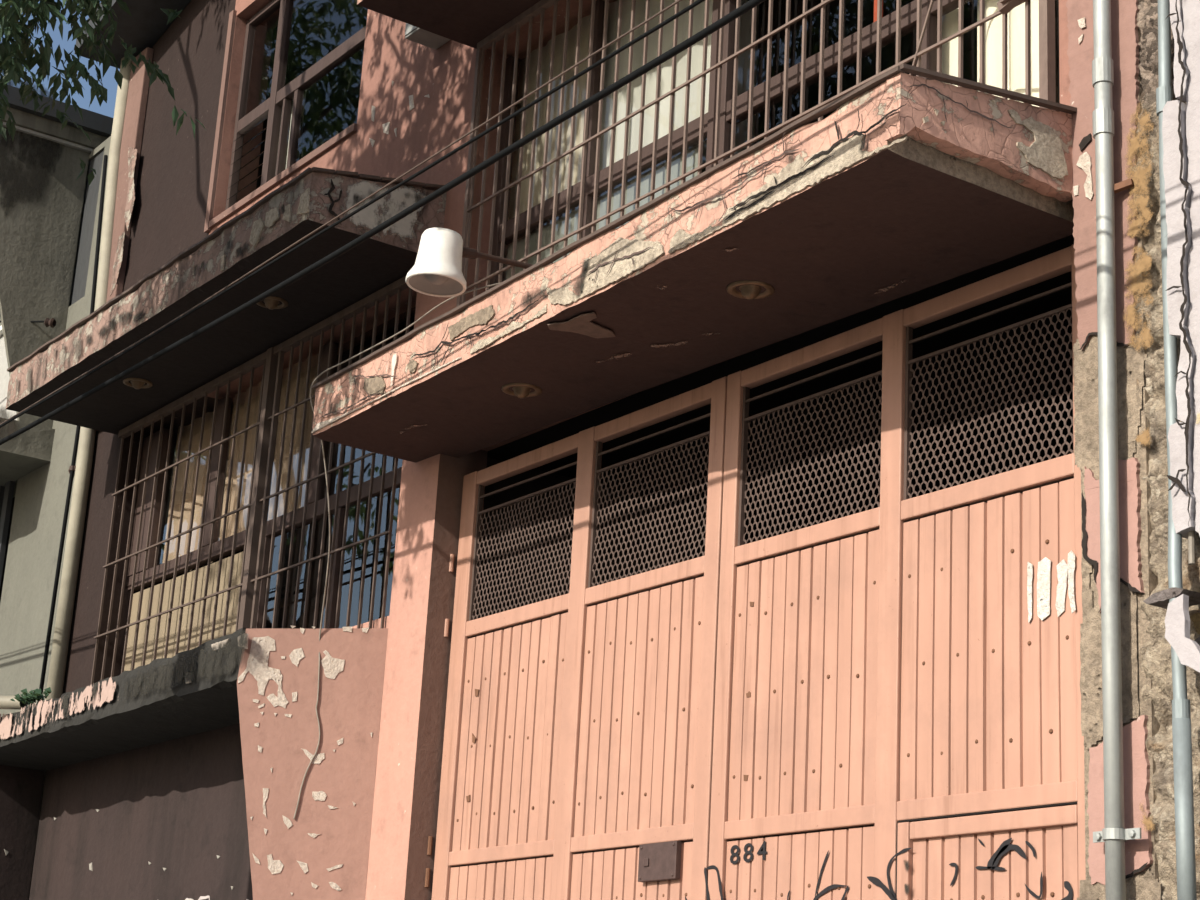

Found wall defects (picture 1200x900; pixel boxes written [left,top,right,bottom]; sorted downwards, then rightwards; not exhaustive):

leakage [3,75,57,100]
leakage [0,127,62,216]
peeling [110,146,137,296]
peeling [249,188,310,248]
peeling [311,134,908,433]
crack [584,84,1011,284]
crack [1165,0,1192,529]
peeling [0,677,116,740]
peeling [211,625,315,727]
peeling [321,650,345,679]
peeling [312,791,337,809]
peeling [253,854,343,891]